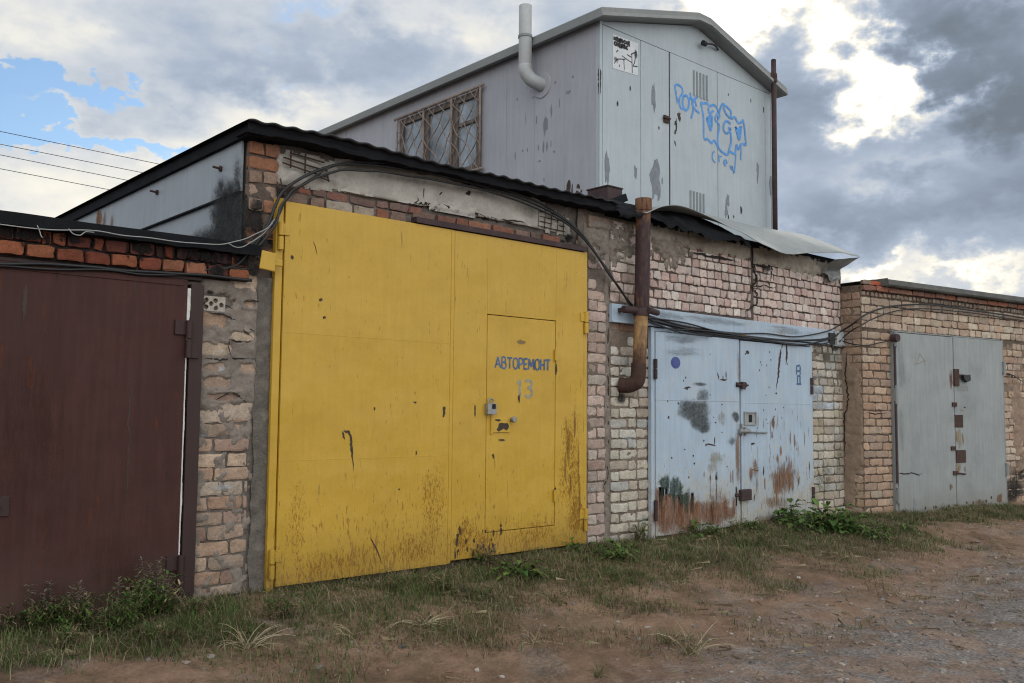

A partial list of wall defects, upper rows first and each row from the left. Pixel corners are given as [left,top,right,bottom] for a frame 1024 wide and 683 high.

peeling [515,75,574,162]
spalling [429,191,476,218]
spalling [537,210,571,235]
crack [693,251,776,316]
peeling [194,279,258,602]
rust [283,400,584,581]
rust [653,473,736,536]
rust [730,417,810,522]
crack [843,352,883,473]